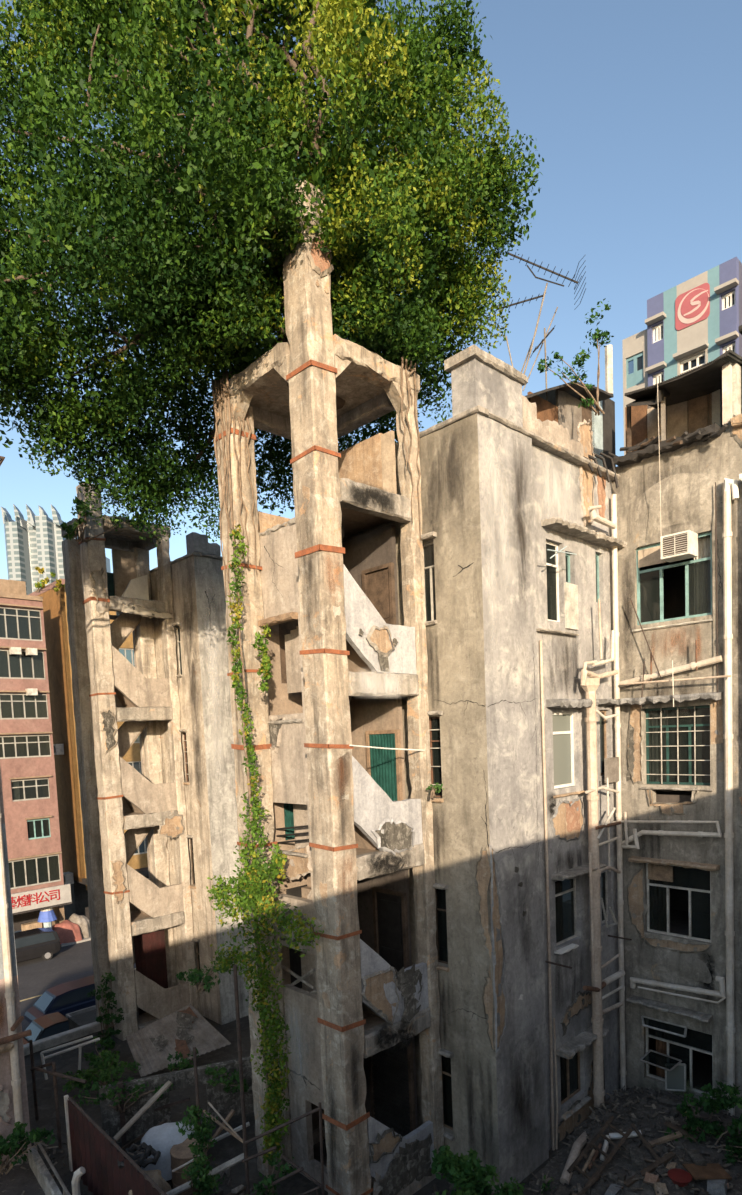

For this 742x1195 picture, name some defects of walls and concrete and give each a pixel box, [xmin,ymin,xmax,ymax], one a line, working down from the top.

peeling [359,625,398,671]
crack [438,651,537,771]
crack [481,770,541,914]
peeling [549,797,585,843]
peeling [474,843,523,1053]
peeling [361,966,402,1026]
peeling [368,1128,433,1195]